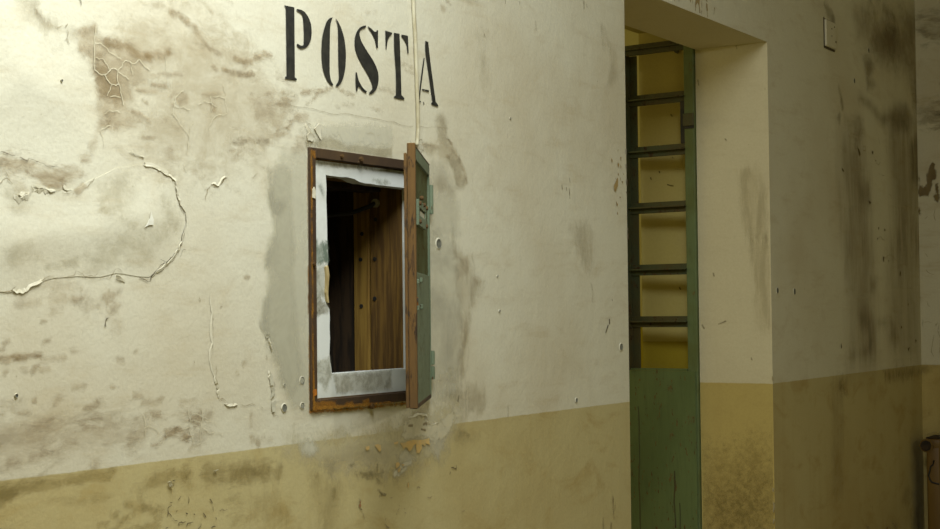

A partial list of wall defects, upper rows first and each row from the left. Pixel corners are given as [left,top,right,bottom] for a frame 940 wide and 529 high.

crack [94,30,167,139]
crack [1,85,228,294]
peeling [918,163,940,214]